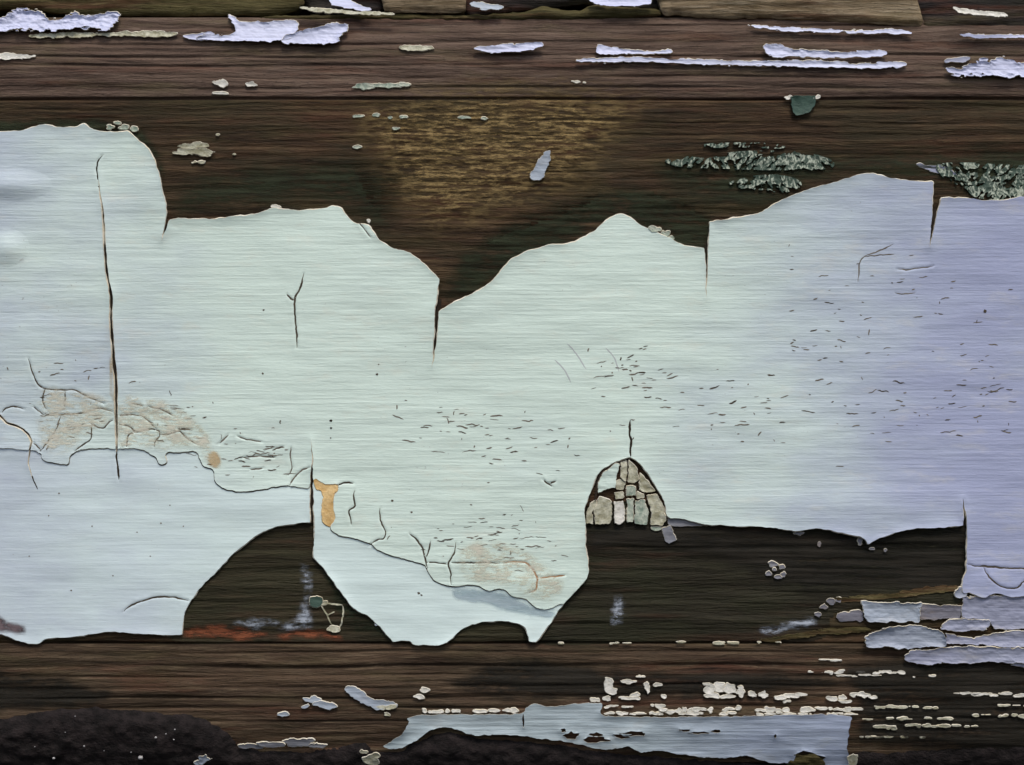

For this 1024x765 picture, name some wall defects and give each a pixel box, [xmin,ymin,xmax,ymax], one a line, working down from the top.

peeling [0,0,395,45]
peeling [474,42,544,54]
peeling [576,24,912,70]
peeling [953,7,1008,18]
peeling [944,56,1024,79]
damp [663,152,1024,202]
crack [587,209,1017,458]
crack [0,156,580,611]
peeling [168,479,391,644]
peeling [448,460,1024,678]
peeling [413,687,519,714]
peeling [590,675,1024,739]